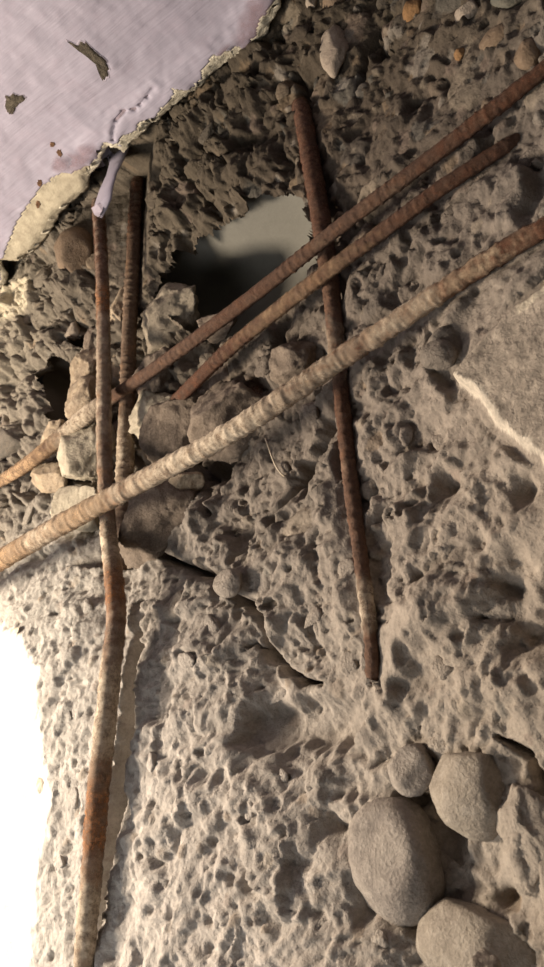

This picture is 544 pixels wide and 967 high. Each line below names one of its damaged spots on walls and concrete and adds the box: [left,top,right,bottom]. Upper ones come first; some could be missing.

spalling [0,0,544,548]
spalling [0,213,544,967]